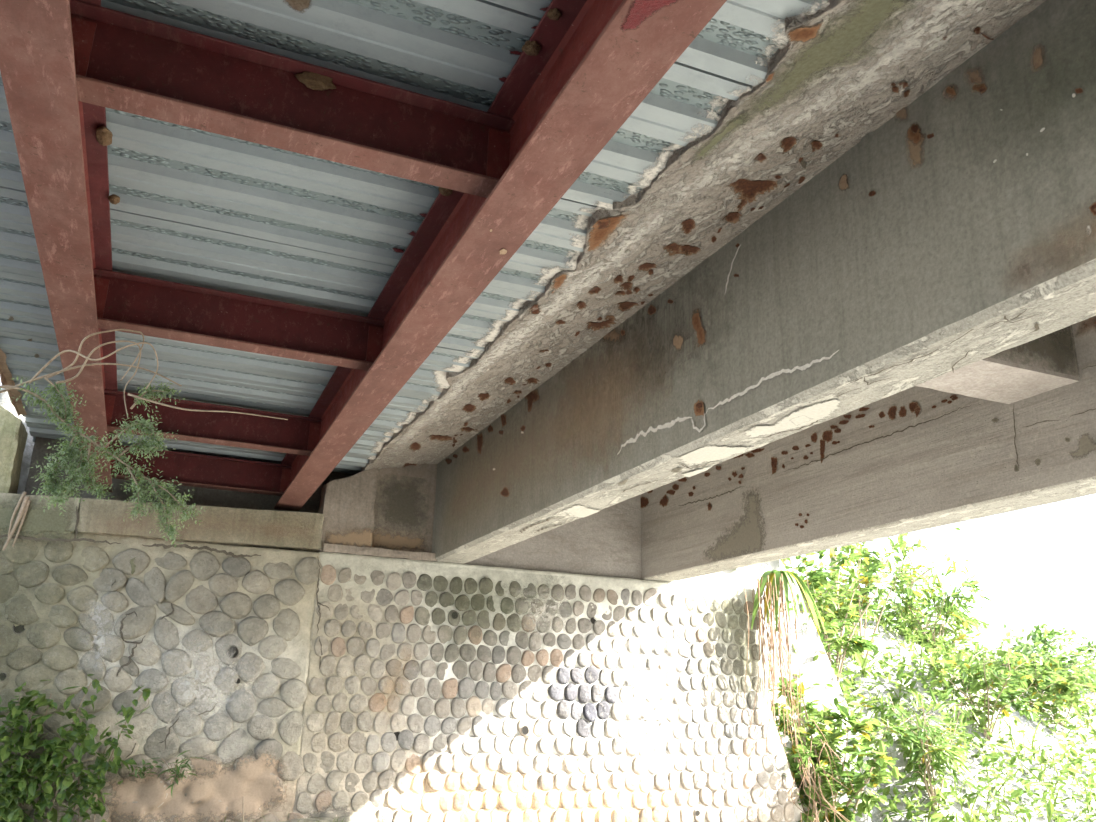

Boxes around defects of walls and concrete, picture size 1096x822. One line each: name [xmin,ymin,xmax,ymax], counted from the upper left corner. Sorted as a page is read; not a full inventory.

peeling [621,0,677,31]
rust [588,214,628,251]
rust [551,275,567,294]
rust [525,389,540,412]
rust [693,400,704,416]
crack [617,350,839,455]
rust [445,413,507,464]
peeling [641,395,958,508]
crack [1013,408,1095,467]